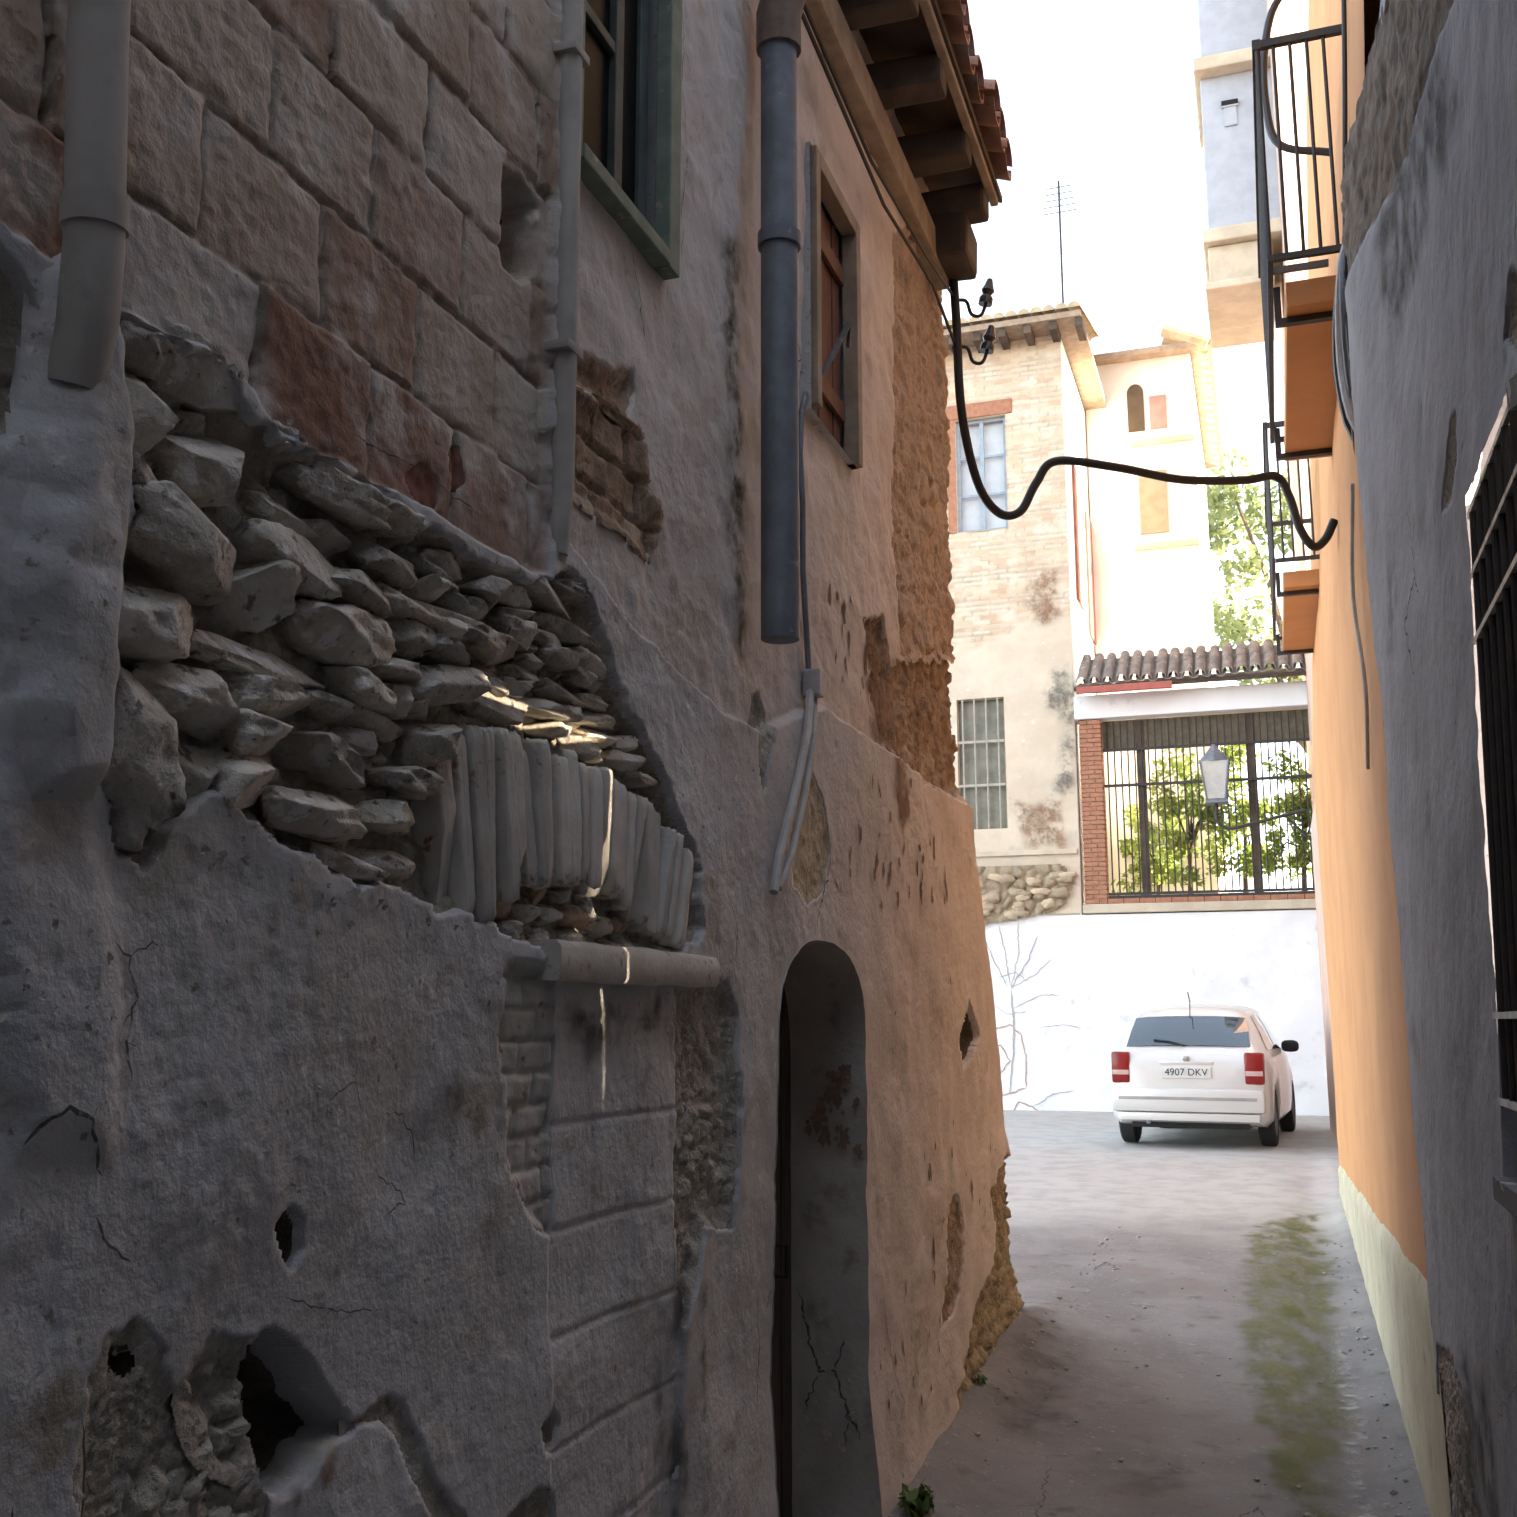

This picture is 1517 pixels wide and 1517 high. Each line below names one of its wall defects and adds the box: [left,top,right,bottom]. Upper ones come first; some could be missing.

spalling [829,227,961,797]
spalling [100,318,687,931]
spalling [789,774,829,905]
peeling [850,777,952,909]
crack [23,1104,103,1176]
crack [116,940,159,1082]
spalling [493,885,697,1243]
spalling [672,981,739,1326]
peeling [72,1319,267,1517]
peeling [339,1397,458,1517]
crack [798,1293,860,1446]
spalling [880,1142,1025,1406]